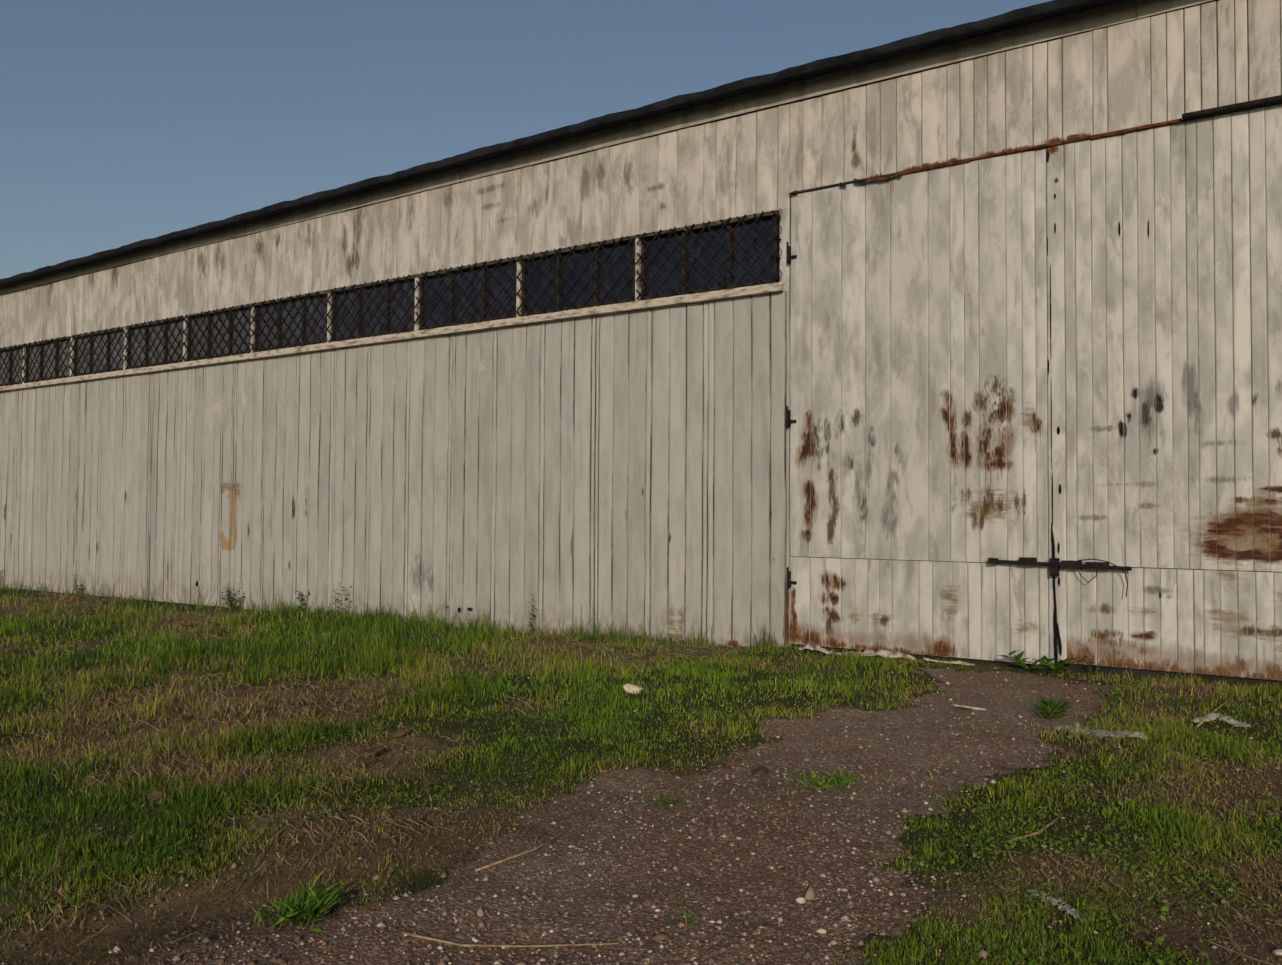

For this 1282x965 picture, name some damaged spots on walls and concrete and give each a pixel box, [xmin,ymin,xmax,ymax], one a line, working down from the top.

corrosion [905,158,961,170]
corrosion [1044,134,1091,154]
corrosion [798,411,830,468]
corrosion [942,376,1026,529]
corrosion [802,481,816,540]
corrosion [1202,486,1282,562]
corrosion [783,572,957,657]